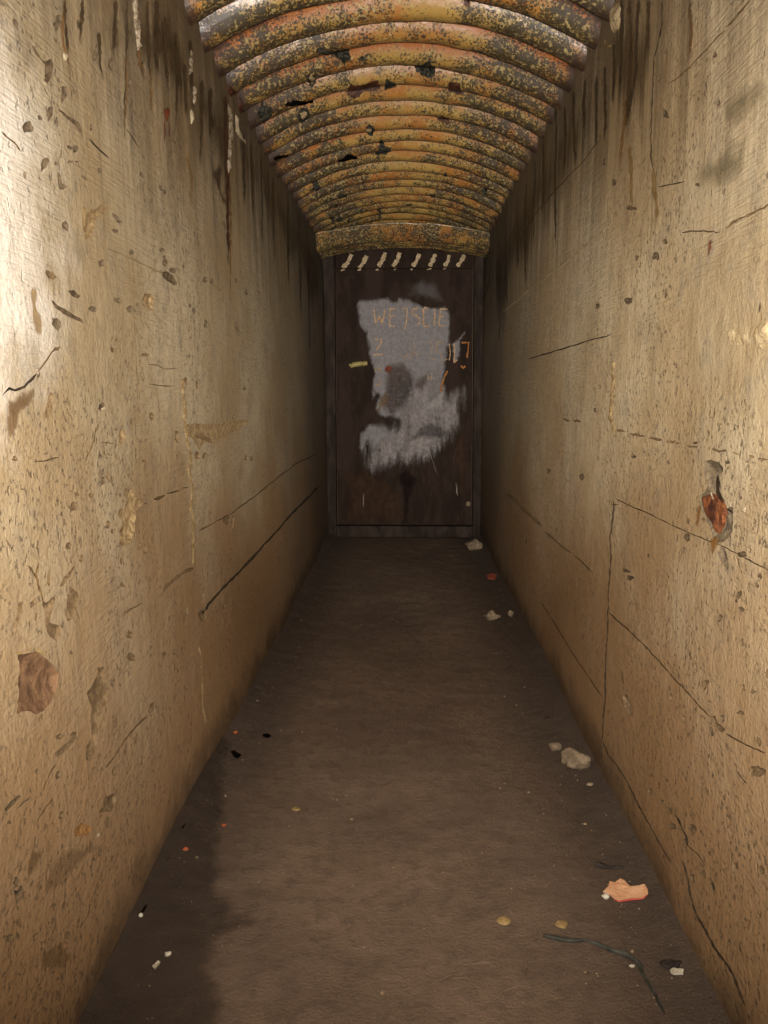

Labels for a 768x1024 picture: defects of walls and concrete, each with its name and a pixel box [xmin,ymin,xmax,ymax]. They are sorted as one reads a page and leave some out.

water stain [63,0,84,52]
water stain [97,0,230,258]
rust [347,79,396,98]
rust [448,82,462,94]
water stain [496,0,650,331]
water stain [242,133,317,338]
crack [3,347,60,395]
crack [202,487,318,613]
spalling [17,648,59,722]
crack [541,499,768,1006]